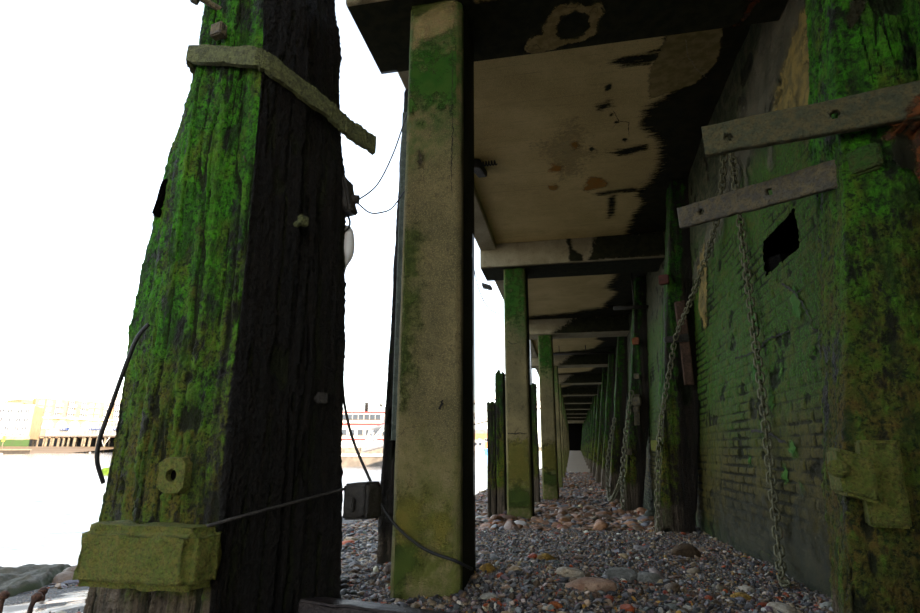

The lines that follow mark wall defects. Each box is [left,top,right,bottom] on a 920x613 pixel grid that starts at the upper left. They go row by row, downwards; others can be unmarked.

peeling [524,2,606,54]
water stain [347,0,805,591]